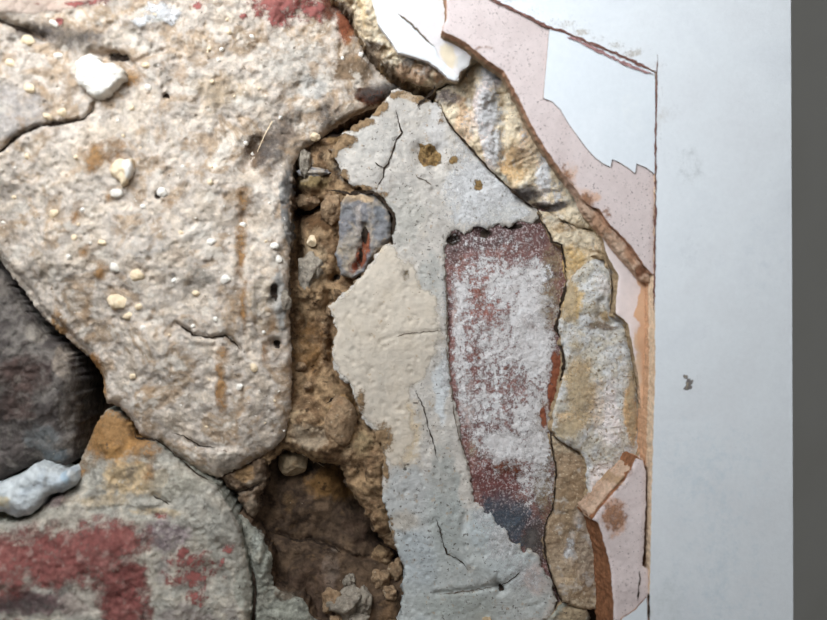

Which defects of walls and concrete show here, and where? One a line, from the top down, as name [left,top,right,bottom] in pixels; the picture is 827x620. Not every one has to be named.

peeling [371,0,480,82]
crack [0,106,94,152]
crack [302,112,403,241]
spalling [418,143,458,167]
crack [417,86,613,382]
spalling [575,192,651,283]
crack [177,323,240,349]
peeling [510,309,560,402]
peeling [483,423,552,471]
crack [435,518,467,568]
peeling [101,561,154,620]
crack [444,571,521,594]